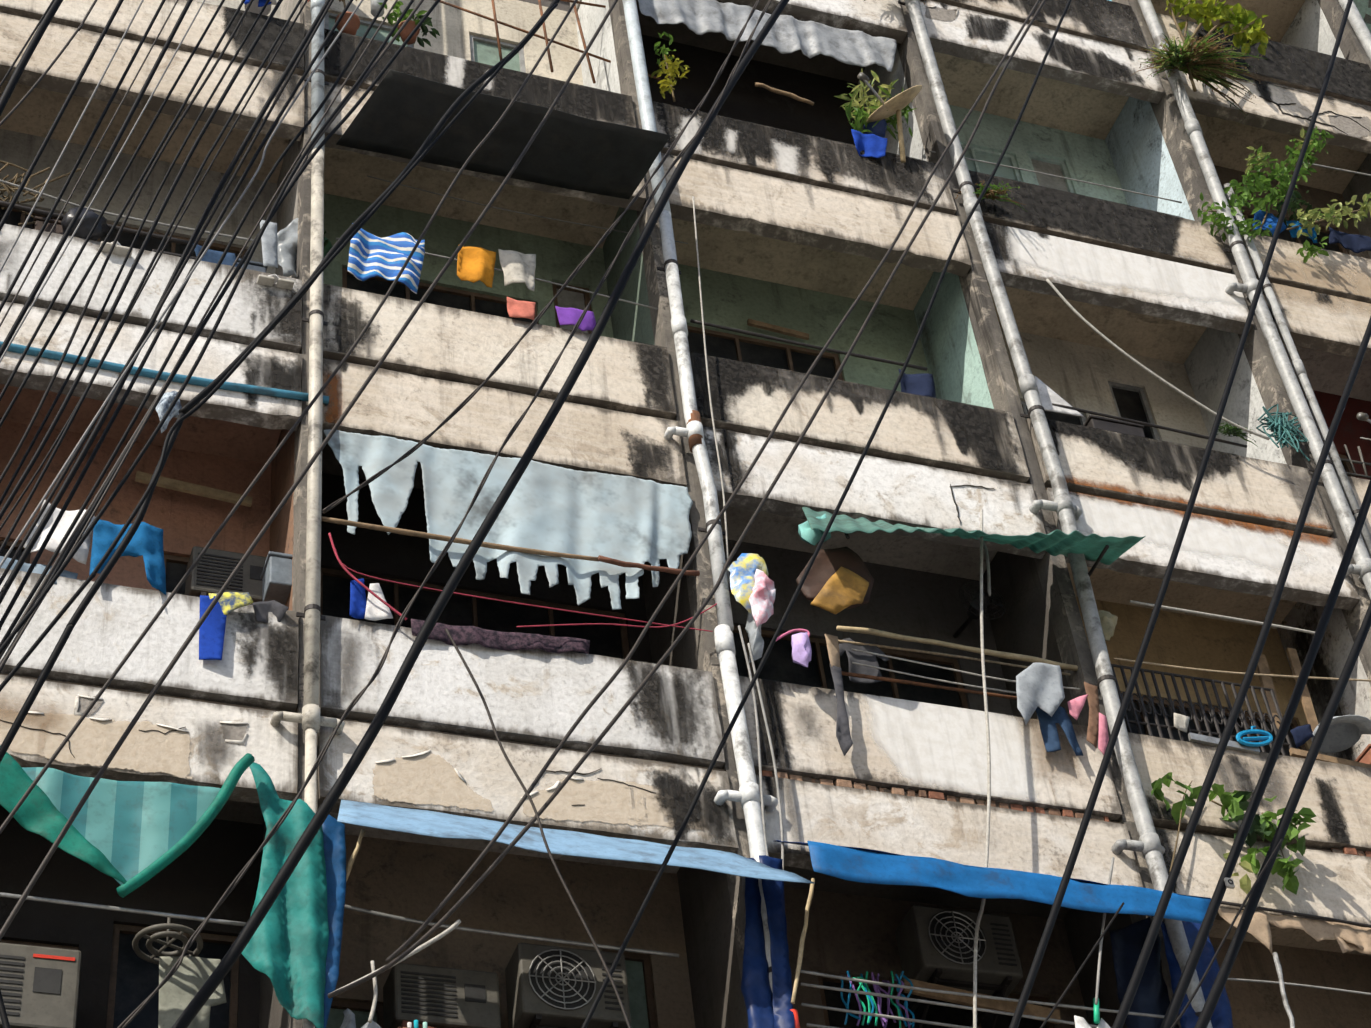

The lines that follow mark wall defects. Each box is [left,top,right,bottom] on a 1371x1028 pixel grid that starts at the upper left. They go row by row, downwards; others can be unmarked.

leakage [653,102,933,208]
leakage [251,287,301,345]
leakage [323,285,375,372]
leakage [244,355,301,405]
leakage [236,610,298,694]
leakage [1292,608,1343,717]
peeling [0,694,192,779]
peeling [220,721,249,745]
peeling [372,750,494,812]
leakage [627,659,732,841]
leakage [1316,778,1350,844]
leakage [1333,747,1356,761]